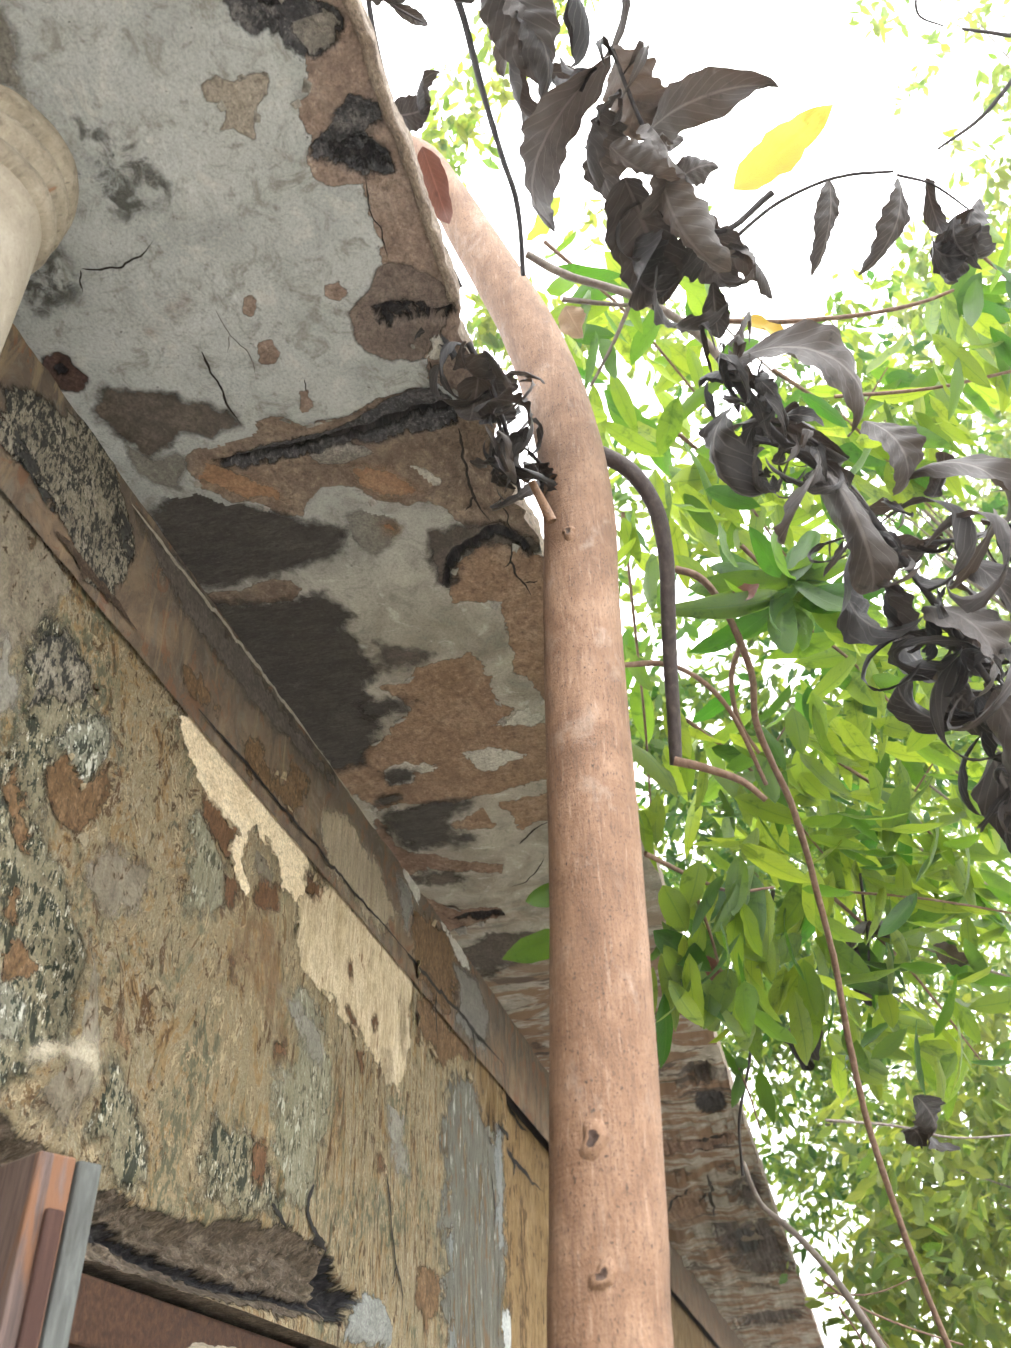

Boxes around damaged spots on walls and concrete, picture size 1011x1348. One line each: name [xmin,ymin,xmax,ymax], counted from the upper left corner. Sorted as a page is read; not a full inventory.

crack [79,241,153,293]
peeling [201,71,269,140]
flaking render [223,0,473,395]
crack [201,312,541,595]
flaking render [183,388,548,876]